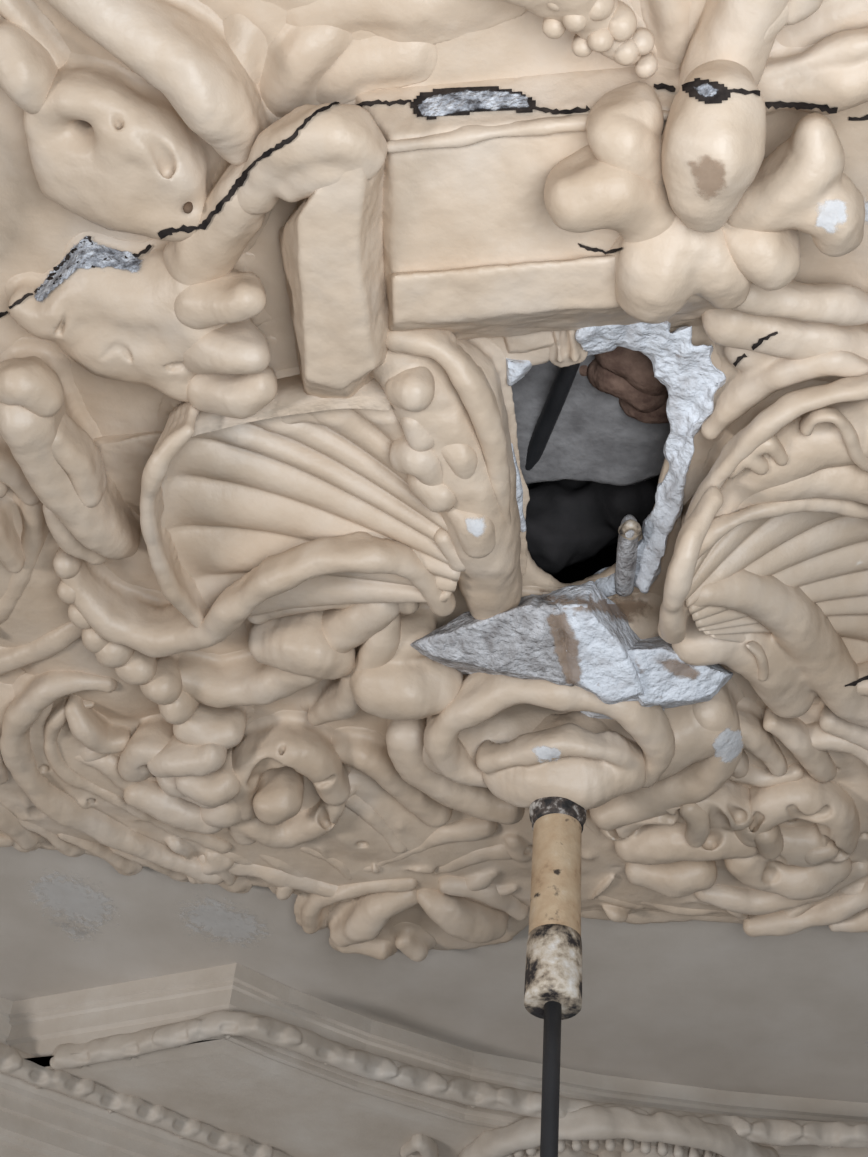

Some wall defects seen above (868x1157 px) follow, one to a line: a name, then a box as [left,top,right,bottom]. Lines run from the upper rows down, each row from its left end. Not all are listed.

spalling [410,86,536,120]
crack [533,105,590,115]
crack [654,83,676,92]
crack [726,88,868,121]
crack [104,99,412,260]
crack [578,243,622,255]
spalling [34,236,142,302]
crack [0,293,34,318]
spalling [506,358,532,386]
spalling [575,321,726,594]
spalling [511,443,526,532]
spalling [410,566,733,719]